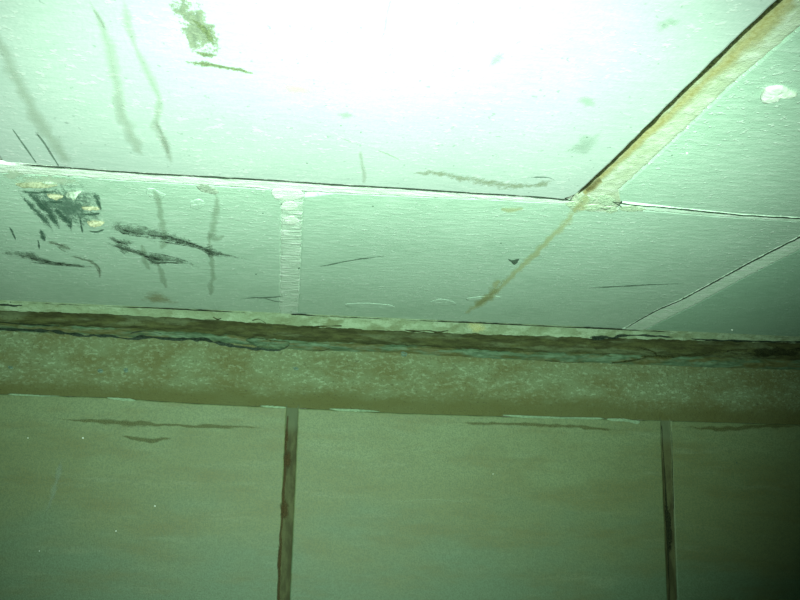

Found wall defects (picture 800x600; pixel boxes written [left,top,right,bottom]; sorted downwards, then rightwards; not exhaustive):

water stain [6,189,103,267]
water stain [110,222,230,265]